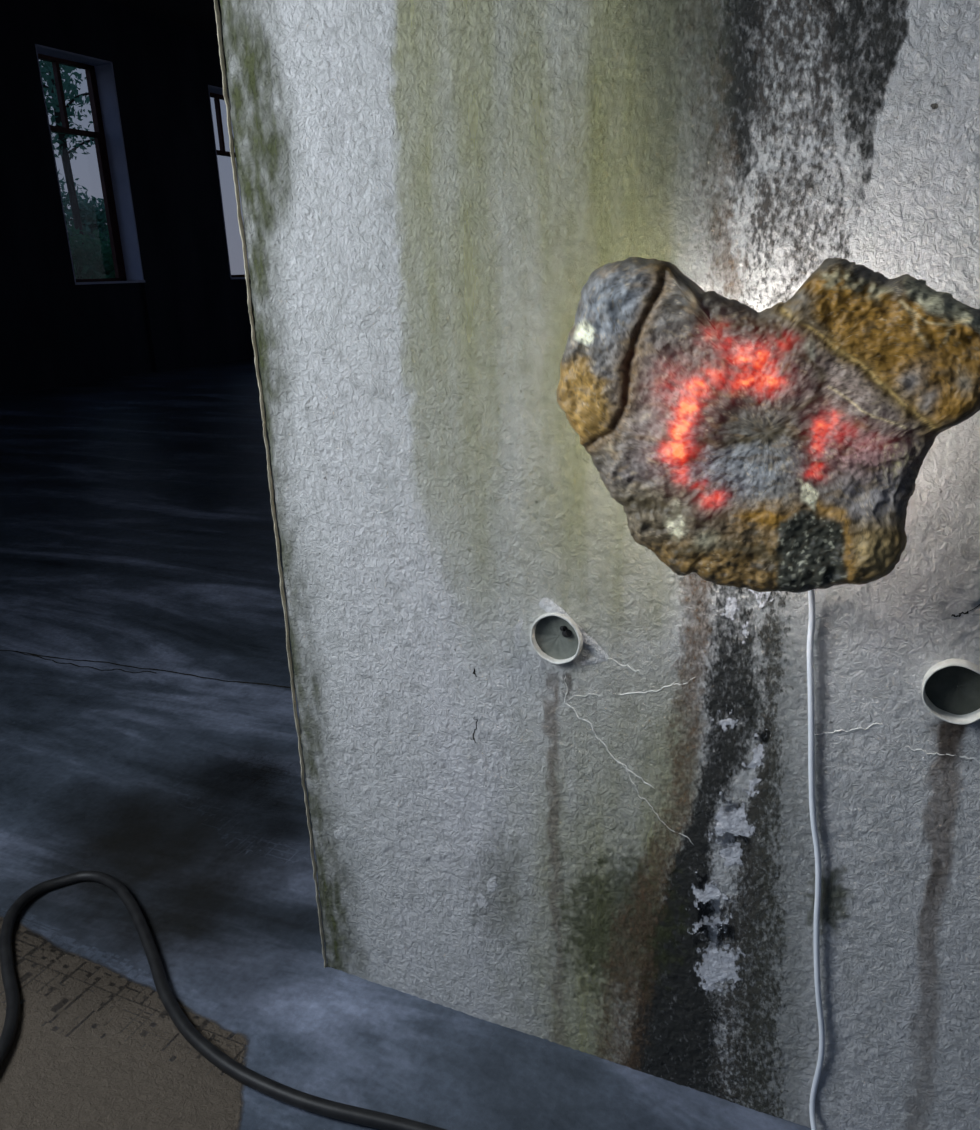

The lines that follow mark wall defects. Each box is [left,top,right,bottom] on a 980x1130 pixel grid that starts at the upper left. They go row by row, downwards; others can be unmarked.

leakage [669,0,908,309]
leakage [577,574,792,1118]